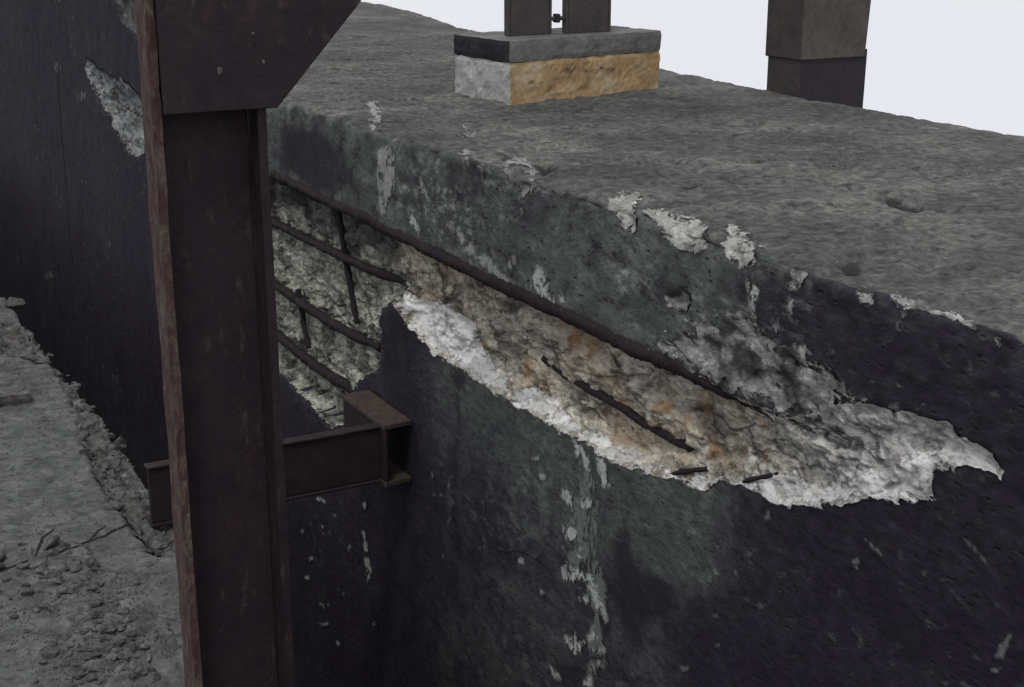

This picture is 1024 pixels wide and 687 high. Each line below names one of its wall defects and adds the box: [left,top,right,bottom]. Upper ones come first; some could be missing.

spalling [85,59,145,158]
spalling [269,169,1004,509]
leakage [561,441,610,687]